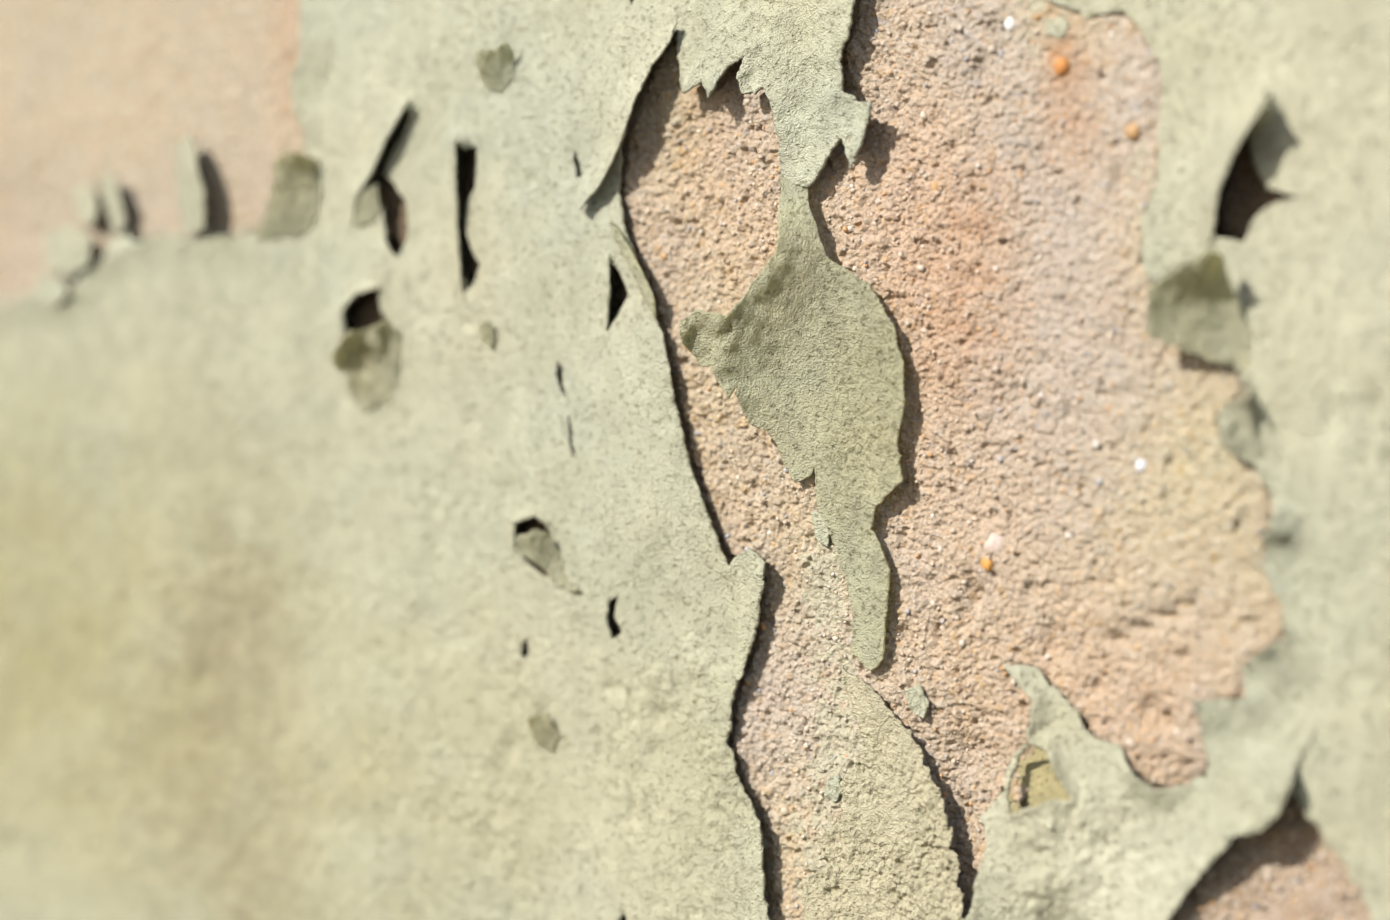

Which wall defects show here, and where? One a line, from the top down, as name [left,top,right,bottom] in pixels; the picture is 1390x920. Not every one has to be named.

peeling [474,43,516,92]
peeling [0,0,321,314]
peeling [353,113,409,256]
peeling [463,147,477,210]
peeling [466,235,480,289]
peeling [331,290,402,413]
peeling [575,0,1297,920]
peeling [516,517,579,592]
peeling [1170,791,1371,920]